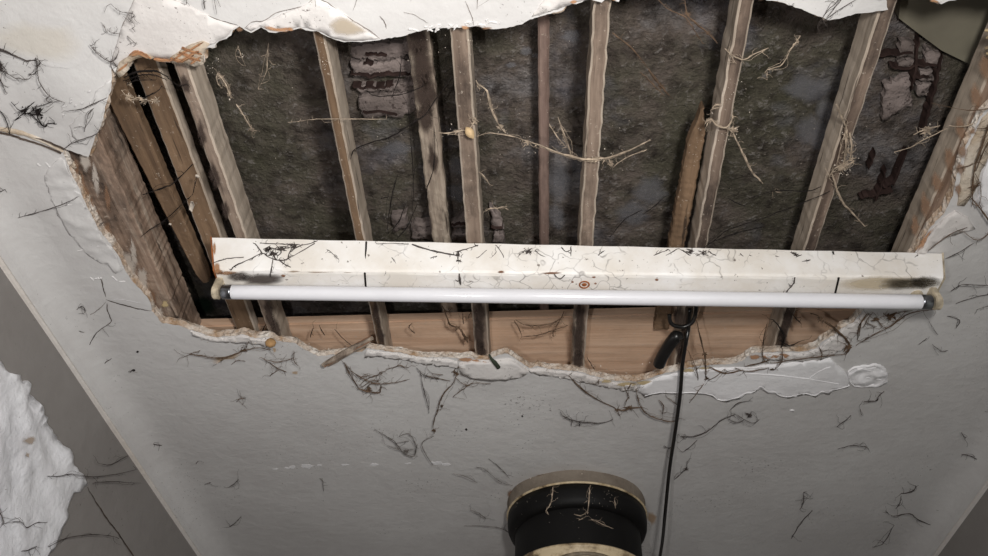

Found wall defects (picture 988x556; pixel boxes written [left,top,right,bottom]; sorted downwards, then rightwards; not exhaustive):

peeling [532,0,584,17]
peeling [111,0,417,119]
flaking render [879,32,943,137]
flaking render [858,145,907,201]
peeling [916,113,988,254]
flaking render [391,207,433,240]
flaking render [451,206,466,241]
flaking render [489,202,505,244]
spalling [190,330,269,347]
peeling [364,313,870,412]